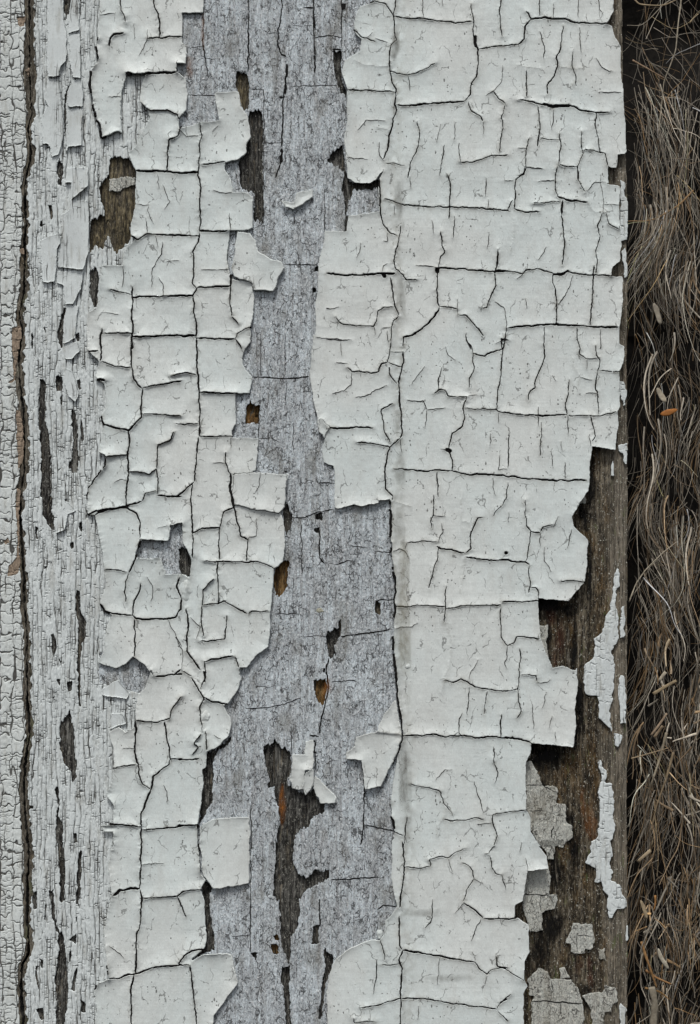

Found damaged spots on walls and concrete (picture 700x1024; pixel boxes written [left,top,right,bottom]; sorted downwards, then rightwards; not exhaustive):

peeling [41,0,83,157]
peeling [40,234,83,304]
peeling [57,306,80,359]
crack [253,0,620,782]
crack [0,0,333,1024]
peeling [87,0,628,1024]
crack [319,877,378,926]
crack [353,769,542,1024]
crack [532,981,583,1016]